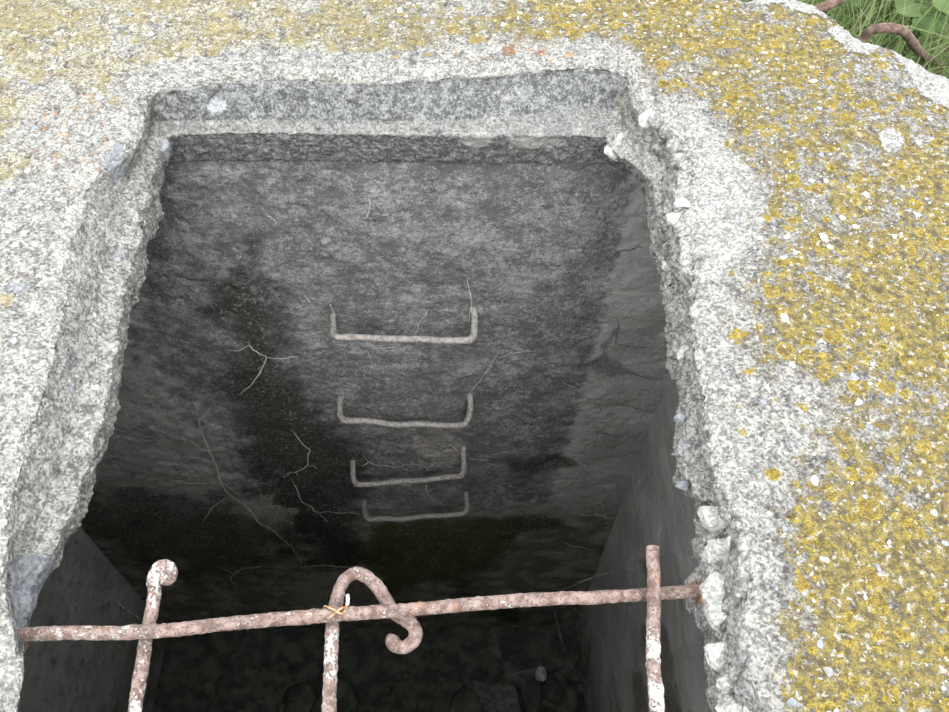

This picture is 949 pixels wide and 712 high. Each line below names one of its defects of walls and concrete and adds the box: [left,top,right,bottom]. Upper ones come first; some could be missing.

damp [592,328,630,375]
damp [81,269,403,606]
damp [508,454,575,472]
spalling [7,553,57,653]
damp [450,587,480,599]
damp [423,607,519,628]
spalling [684,503,771,712]